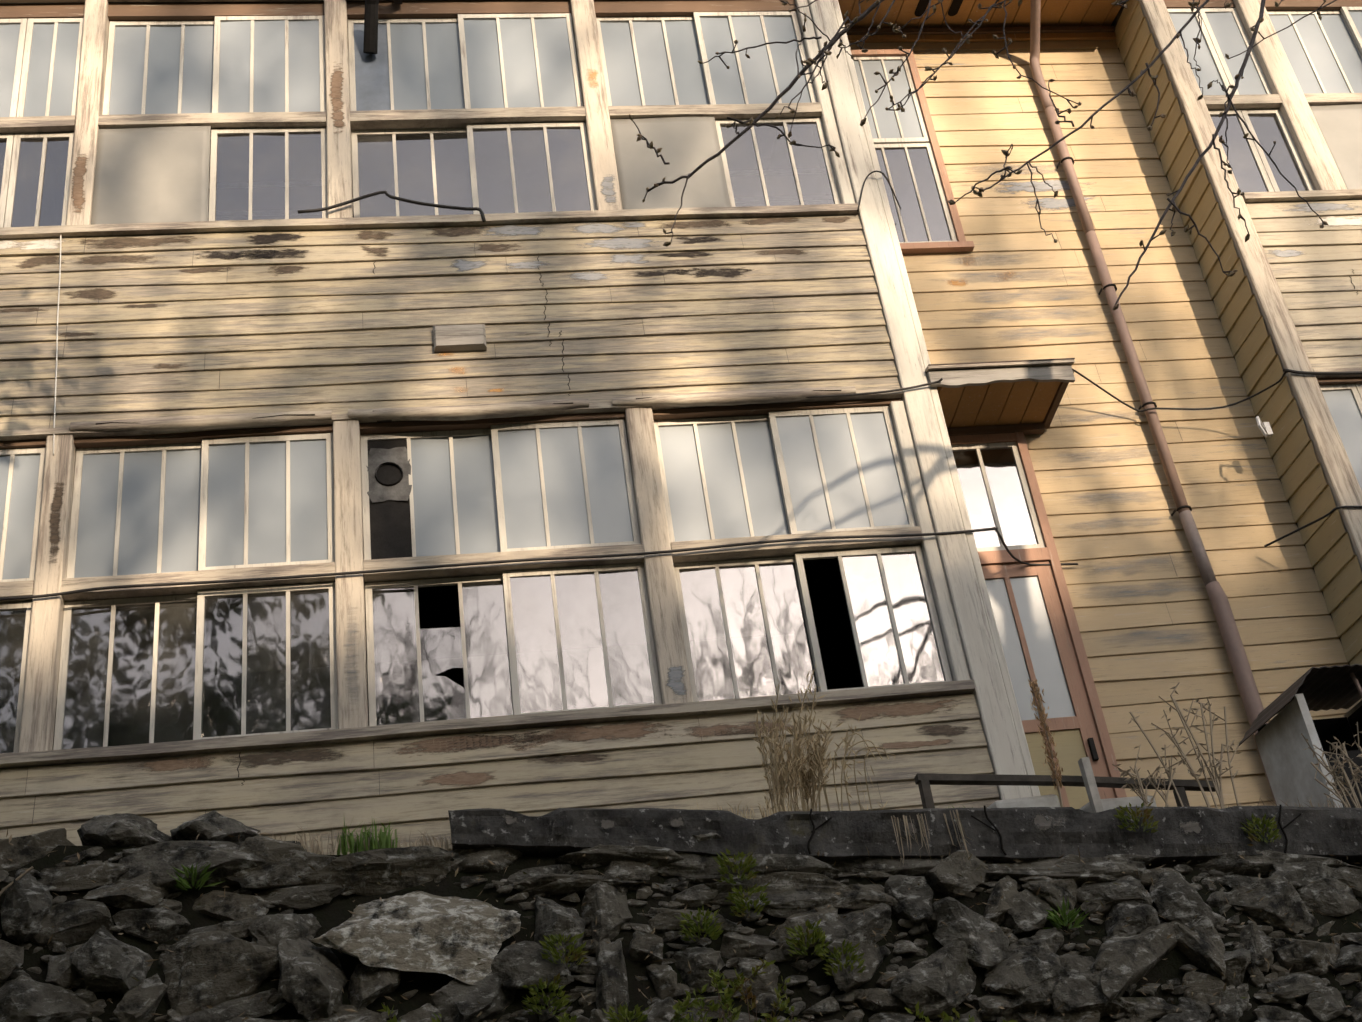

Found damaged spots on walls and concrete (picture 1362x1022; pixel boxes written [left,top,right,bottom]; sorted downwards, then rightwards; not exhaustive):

peeling [330,68,345,132]
peeling [71,154,87,212]
peeling [0,233,307,274]
peeling [452,225,544,272]
peeling [569,222,754,280]
peeling [138,757,215,771]
peeling [232,749,343,768]